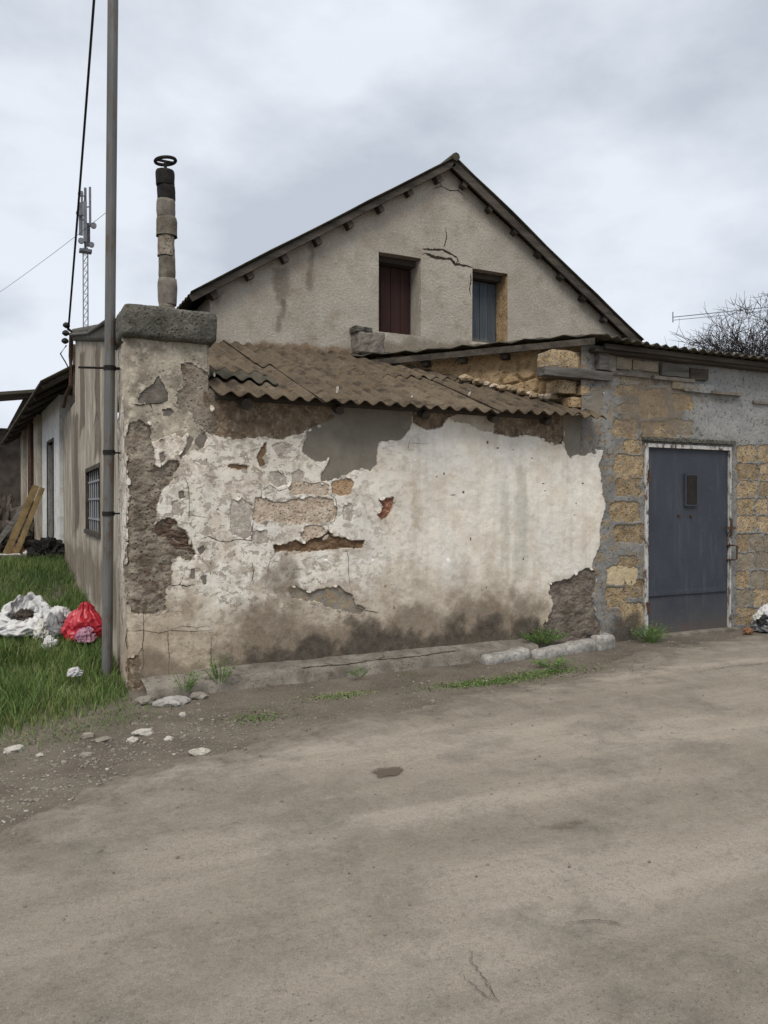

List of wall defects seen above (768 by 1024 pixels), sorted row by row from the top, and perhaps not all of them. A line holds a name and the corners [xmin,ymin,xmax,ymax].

crack [422,228,472,295]
spalling [412,406,565,450]
spalling [120,338,367,616]
flaking render [377,497,396,520]
water stain [222,597,559,667]
spalling [544,568,601,645]